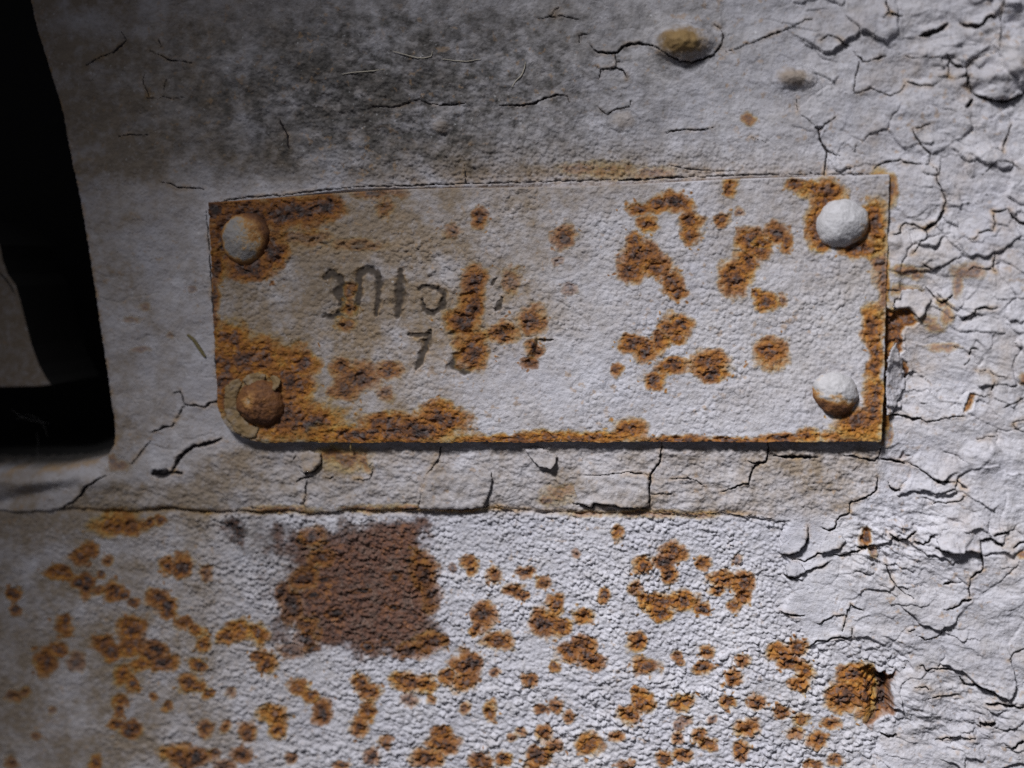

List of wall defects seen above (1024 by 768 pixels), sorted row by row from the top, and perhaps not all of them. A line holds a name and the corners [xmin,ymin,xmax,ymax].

crack [538,0,1024,176]
crack [162,98,998,329]
corrosion [208,170,921,472]
crack [890,347,1024,440]
crack [572,442,818,519]
peeling [780,526,808,577]
peeling [820,535,846,553]
spalling [861,528,871,545]
crack [781,448,967,599]
corrosion [468,631,876,768]
crack [780,603,862,648]
crack [908,531,1024,740]